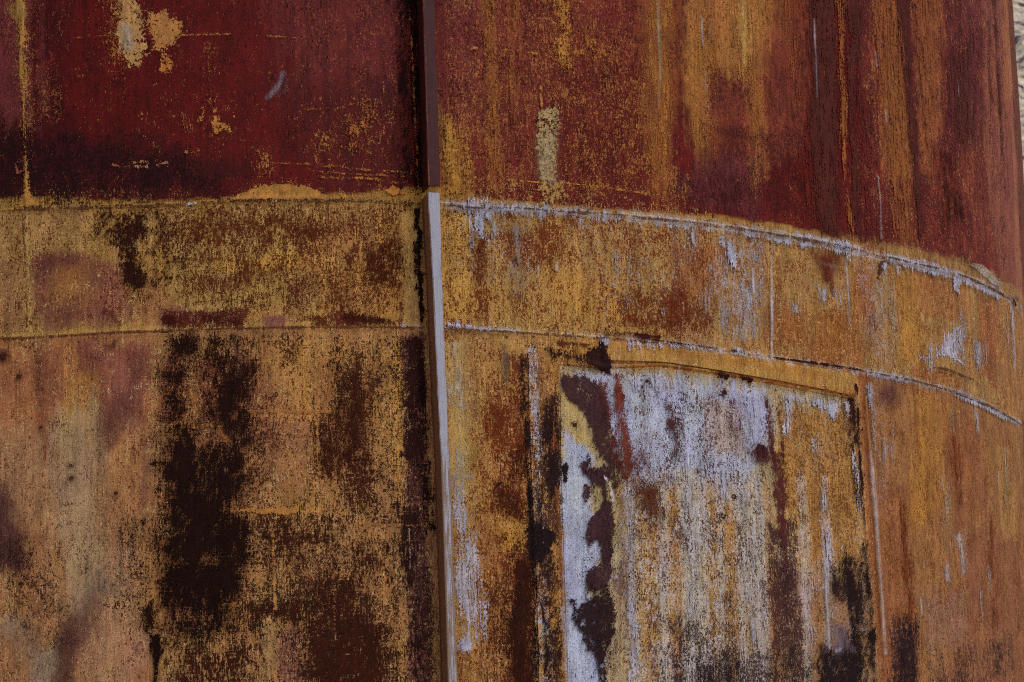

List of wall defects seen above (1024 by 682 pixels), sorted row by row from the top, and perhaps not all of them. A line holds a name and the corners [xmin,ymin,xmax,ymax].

peeling [98,0,187,75]
peeling [535,85,569,205]
corrosion [80,191,437,682]
corrosion [482,351,578,682]
peeling [560,371,644,682]
corrosion [544,284,927,682]